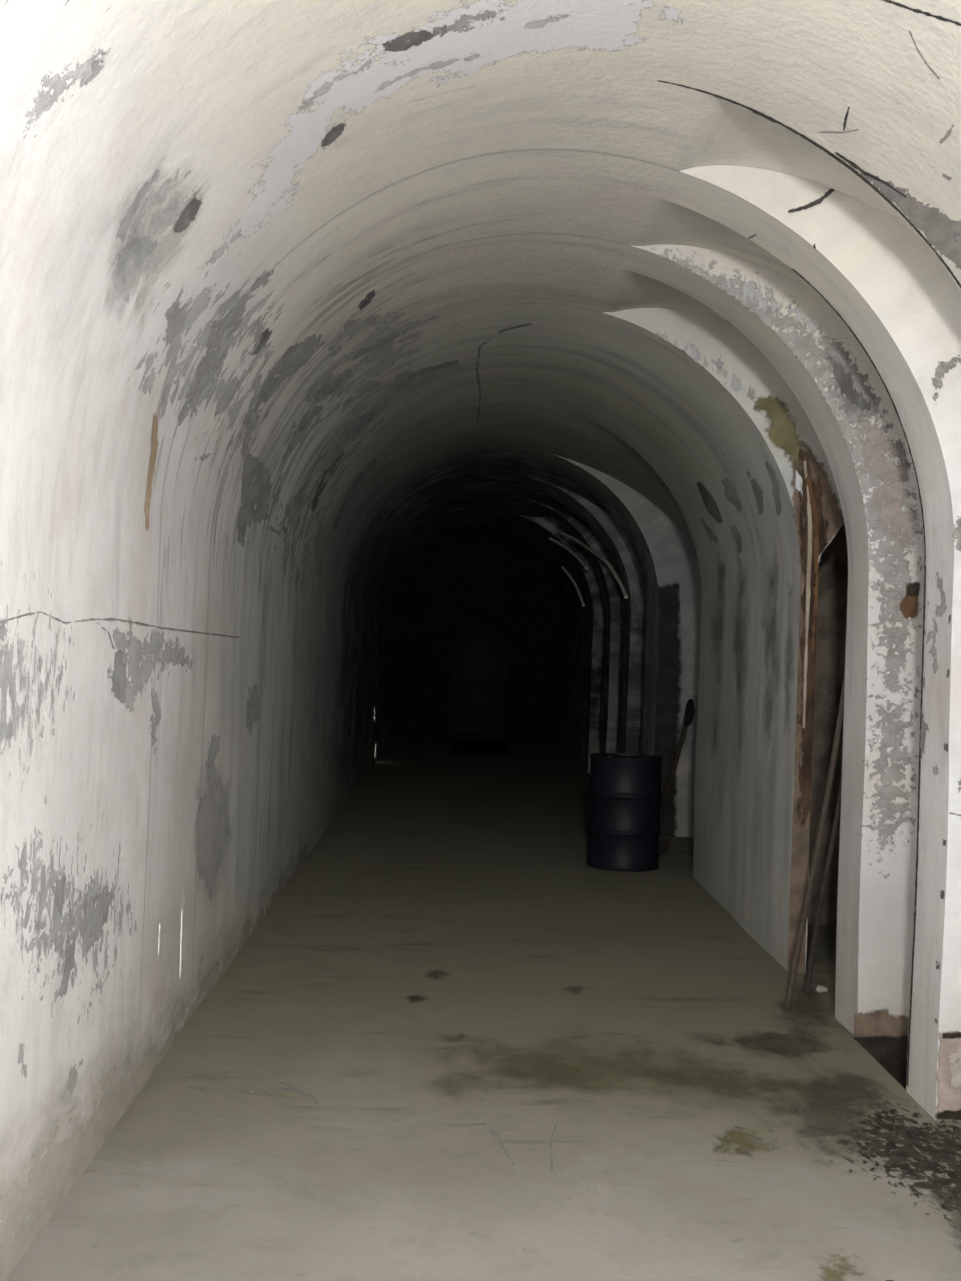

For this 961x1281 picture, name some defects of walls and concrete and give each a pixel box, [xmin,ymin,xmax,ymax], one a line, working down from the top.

crack [884,0,961,79]
crack [658,80,961,288]
peeling [112,0,686,585]
corrosion [144,414,158,529]
peeling [0,606,75,786]
peeling [653,247,951,879]
crack [792,244,926,1086]
corrosion [899,582,920,619]
peeling [1,825,137,1023]
damp [716,1127,775,1156]
damp [783,1075,881,1142]
damp [853,1009,909,1090]